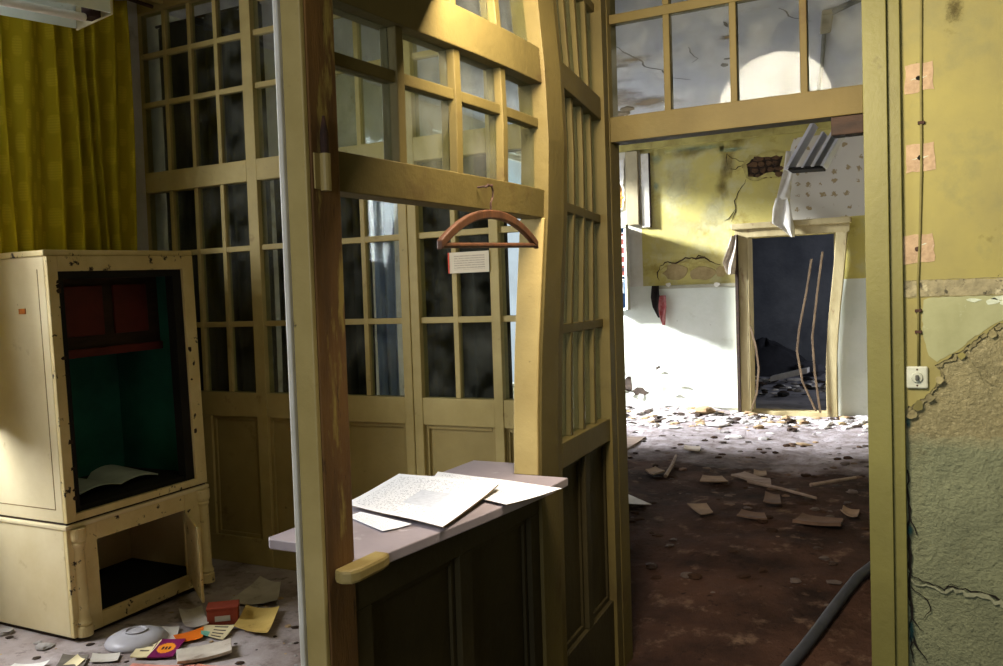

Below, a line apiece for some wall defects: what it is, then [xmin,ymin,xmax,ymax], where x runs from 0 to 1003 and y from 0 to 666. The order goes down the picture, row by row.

leakage [618,93,665,106]
crack [726,154,746,222]
flaking render [742,152,786,181]
flaking render [903,277,1003,666]
crack [906,470,1003,663]